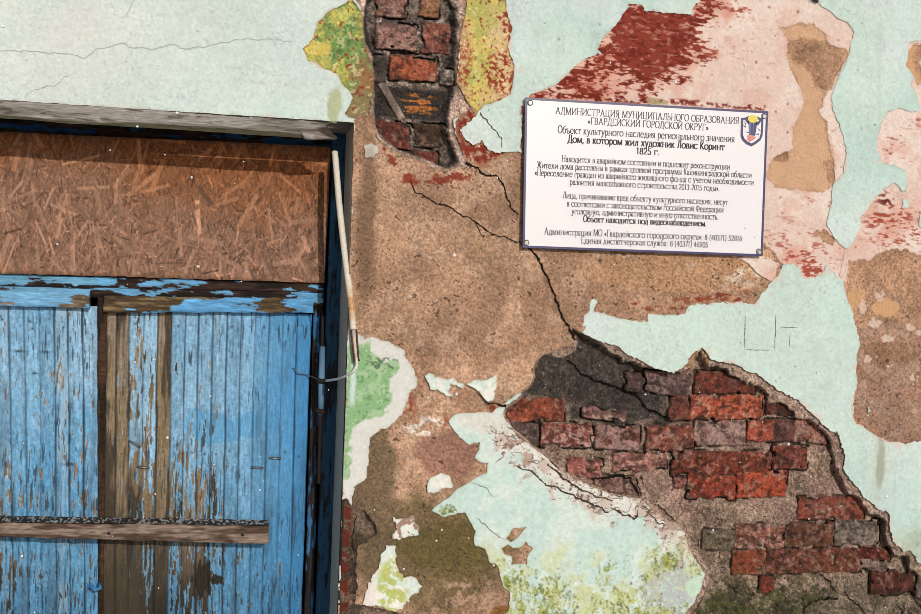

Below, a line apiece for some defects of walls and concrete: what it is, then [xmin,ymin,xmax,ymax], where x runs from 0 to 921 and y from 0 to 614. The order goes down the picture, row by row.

crack [466,162,519,214]
crack [410,181,671,419]
peeling [303,0,921,614]